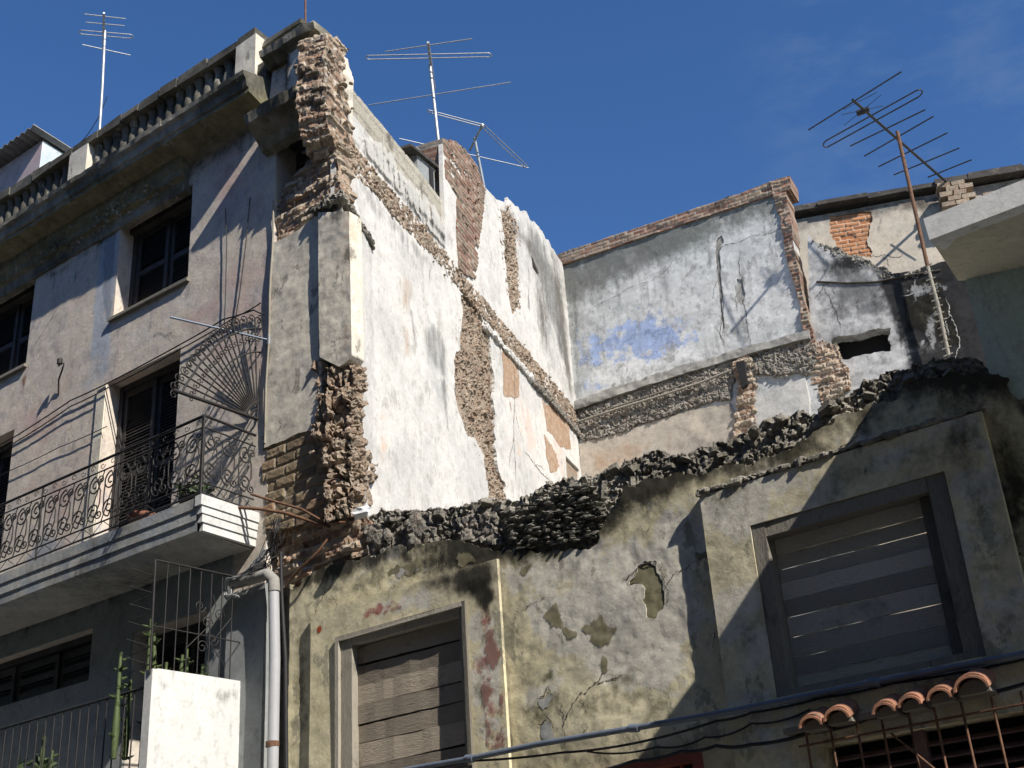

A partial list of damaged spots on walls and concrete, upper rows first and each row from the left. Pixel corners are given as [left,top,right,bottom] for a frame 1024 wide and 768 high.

spalling [274,33,386,241]
spalling [498,205,522,314]
crack [712,229,780,345]
flaking render [828,212,873,258]
spalling [407,223,666,517]
spalling [707,339,851,431]
flaking render [262,431,328,531]
spalling [716,438,734,460]
damp [468,578,494,612]
peeling [544,603,617,673]
peeling [623,561,669,619]
crack [560,666,629,745]